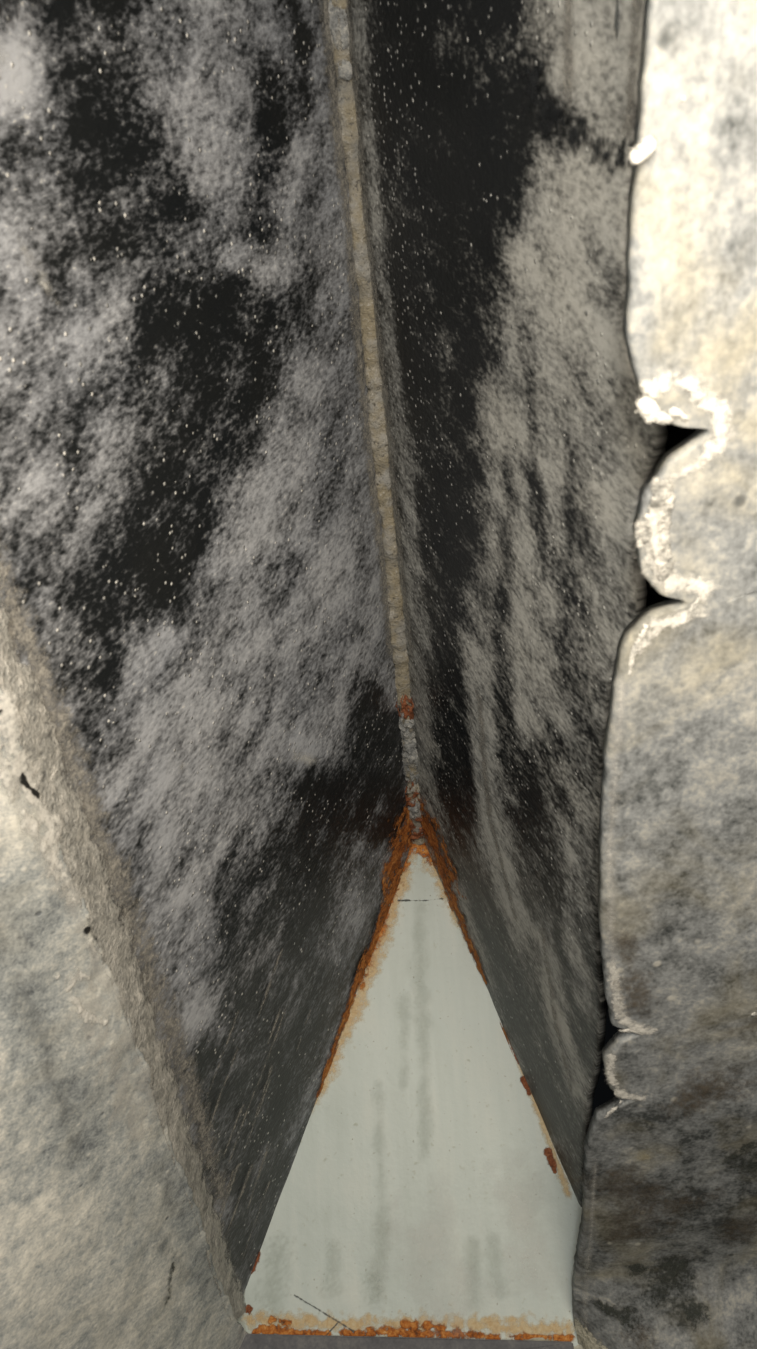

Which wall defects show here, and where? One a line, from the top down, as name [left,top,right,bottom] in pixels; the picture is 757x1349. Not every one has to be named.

rust [316,781,487,1102]
rust [500,1023,570,1196]
rust [244,1305,574,1342]
leakage [593,1299,646,1349]
leakage [626,1255,710,1327]